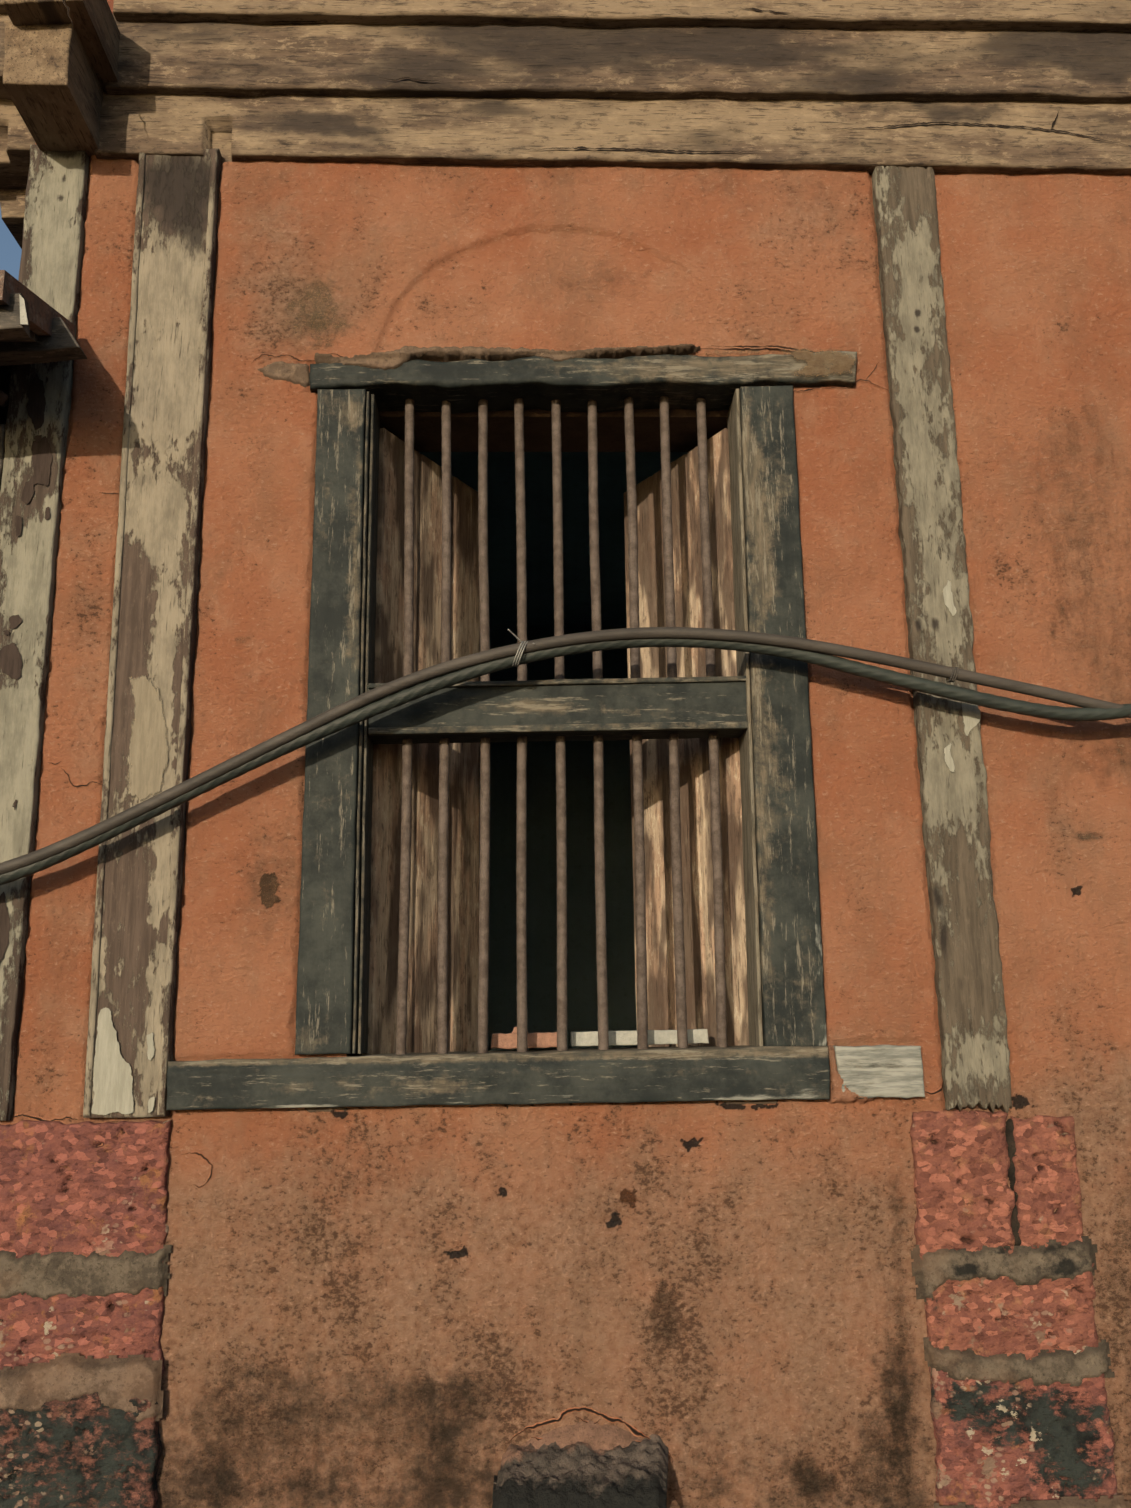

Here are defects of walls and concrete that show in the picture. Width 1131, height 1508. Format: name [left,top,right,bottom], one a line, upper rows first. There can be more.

peeling [0,615,23,679]
peeling [128,675,170,801]
peeling [0,892,10,961]
peeling [91,1008,155,1115]